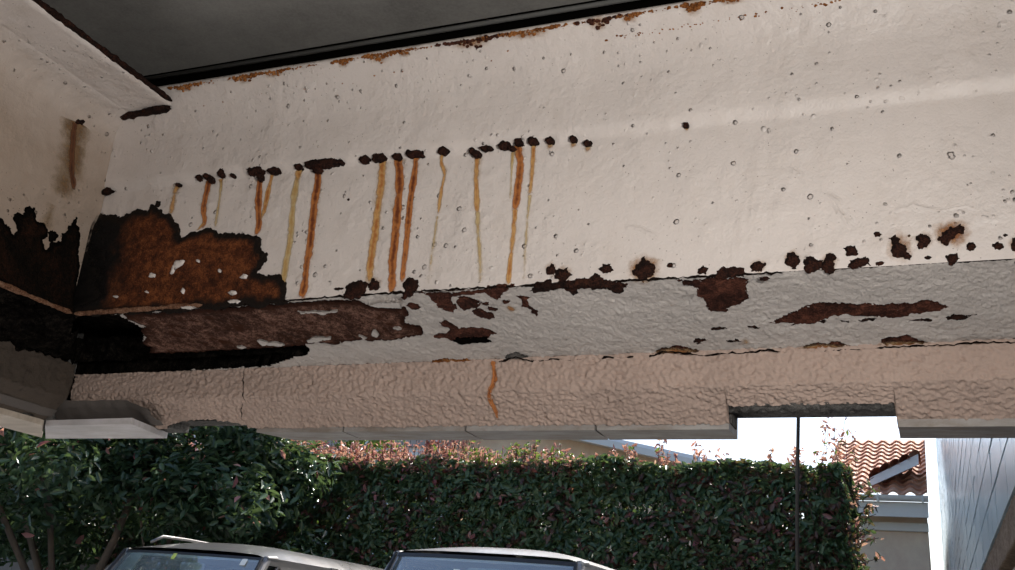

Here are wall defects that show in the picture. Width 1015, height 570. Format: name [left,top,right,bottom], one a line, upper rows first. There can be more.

rust [330,0,767,66]
rust [469,136,555,284]
peeling [0,281,202,316]
spalling [75,334,307,363]
rust [0,149,426,354]
peeling [406,273,628,345]
rust [546,263,572,282]
rust [631,256,673,283]
spalling [675,266,749,312]
peeling [694,326,747,345]
peeling [770,300,977,326]
rust [785,223,976,275]